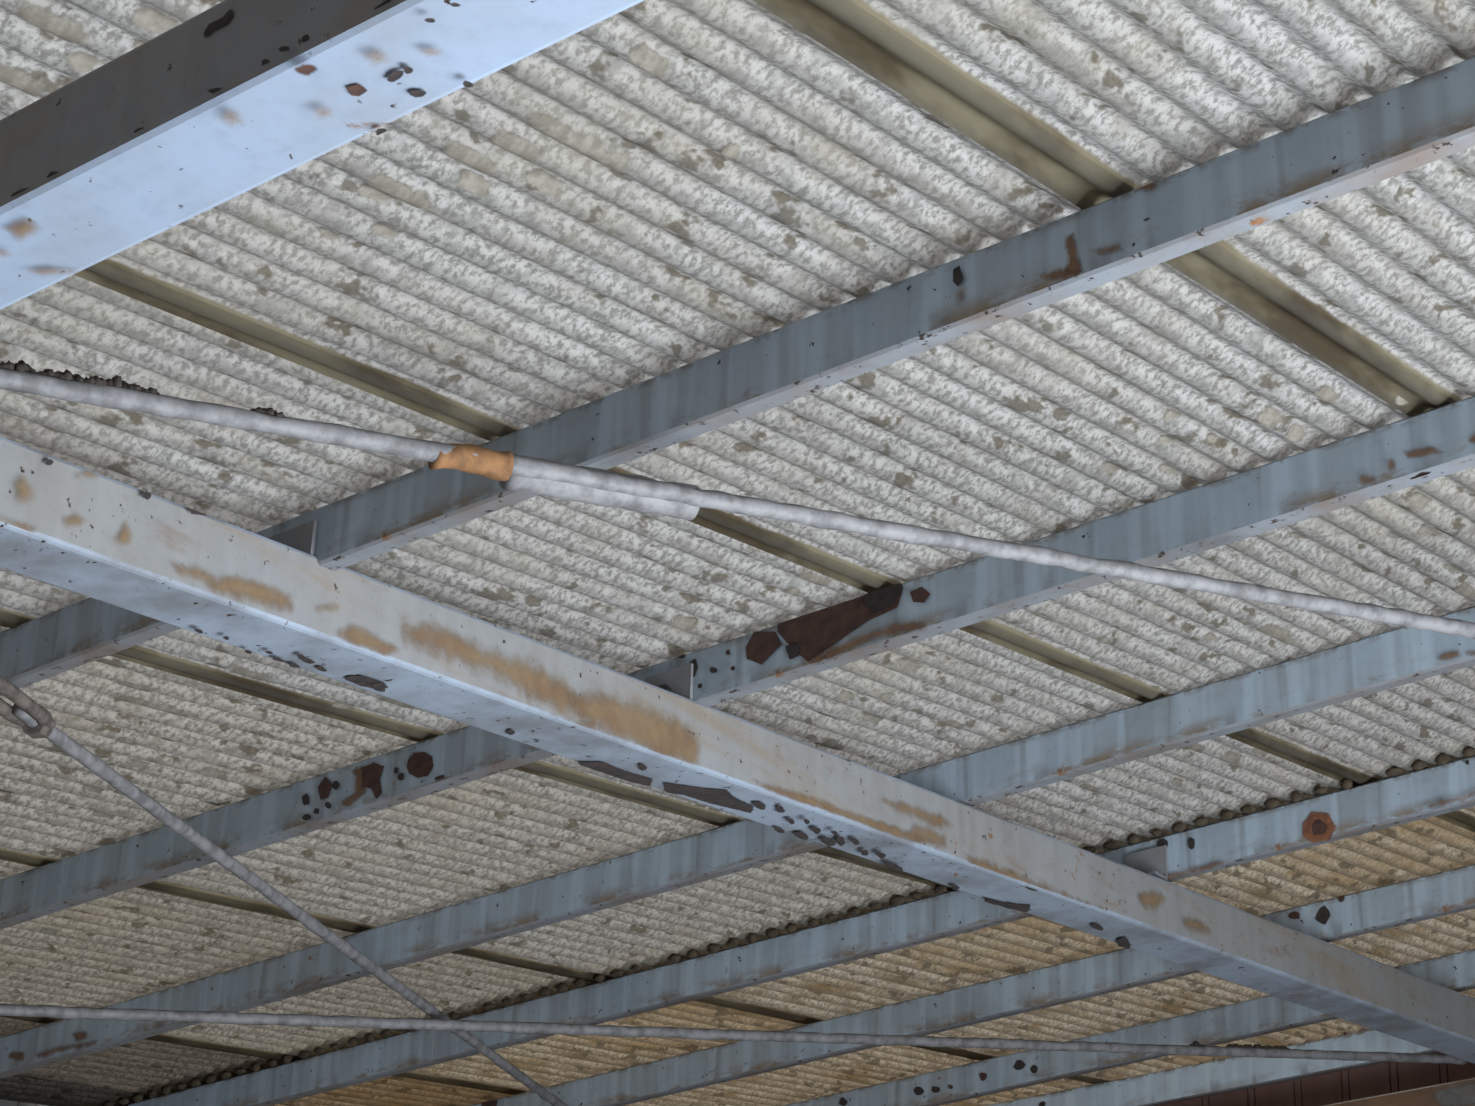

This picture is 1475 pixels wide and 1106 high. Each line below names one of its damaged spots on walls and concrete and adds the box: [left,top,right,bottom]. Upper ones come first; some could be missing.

rust [10,222,34,237]
rust [1045,235,1081,279]
rust [953,266,963,299]
rust [746,583,930,664]
rust [302,752,444,820]
rust [1303,812,1336,843]